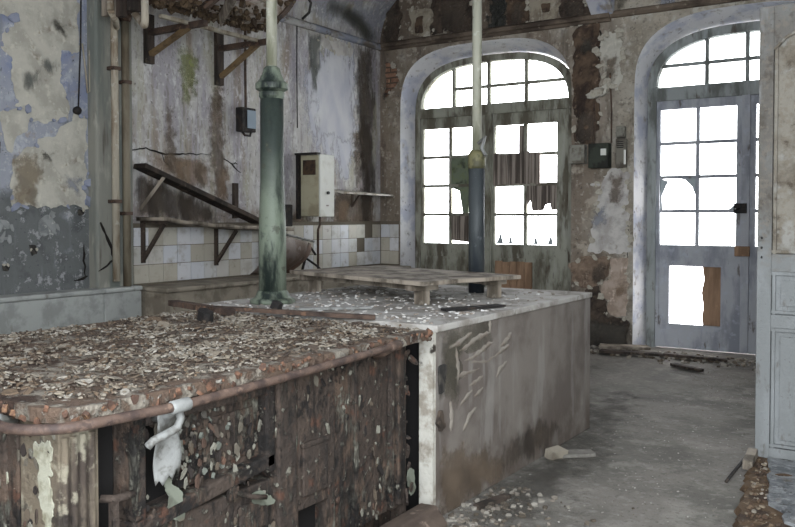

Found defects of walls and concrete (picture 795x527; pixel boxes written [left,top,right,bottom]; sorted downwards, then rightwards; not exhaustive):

corrosion [149,0,266,34]
spalling [383,0,414,42]
spalling [423,0,472,37]
spalling [505,0,534,25]
peeling [0,0,91,244]
crack [132,147,241,173]